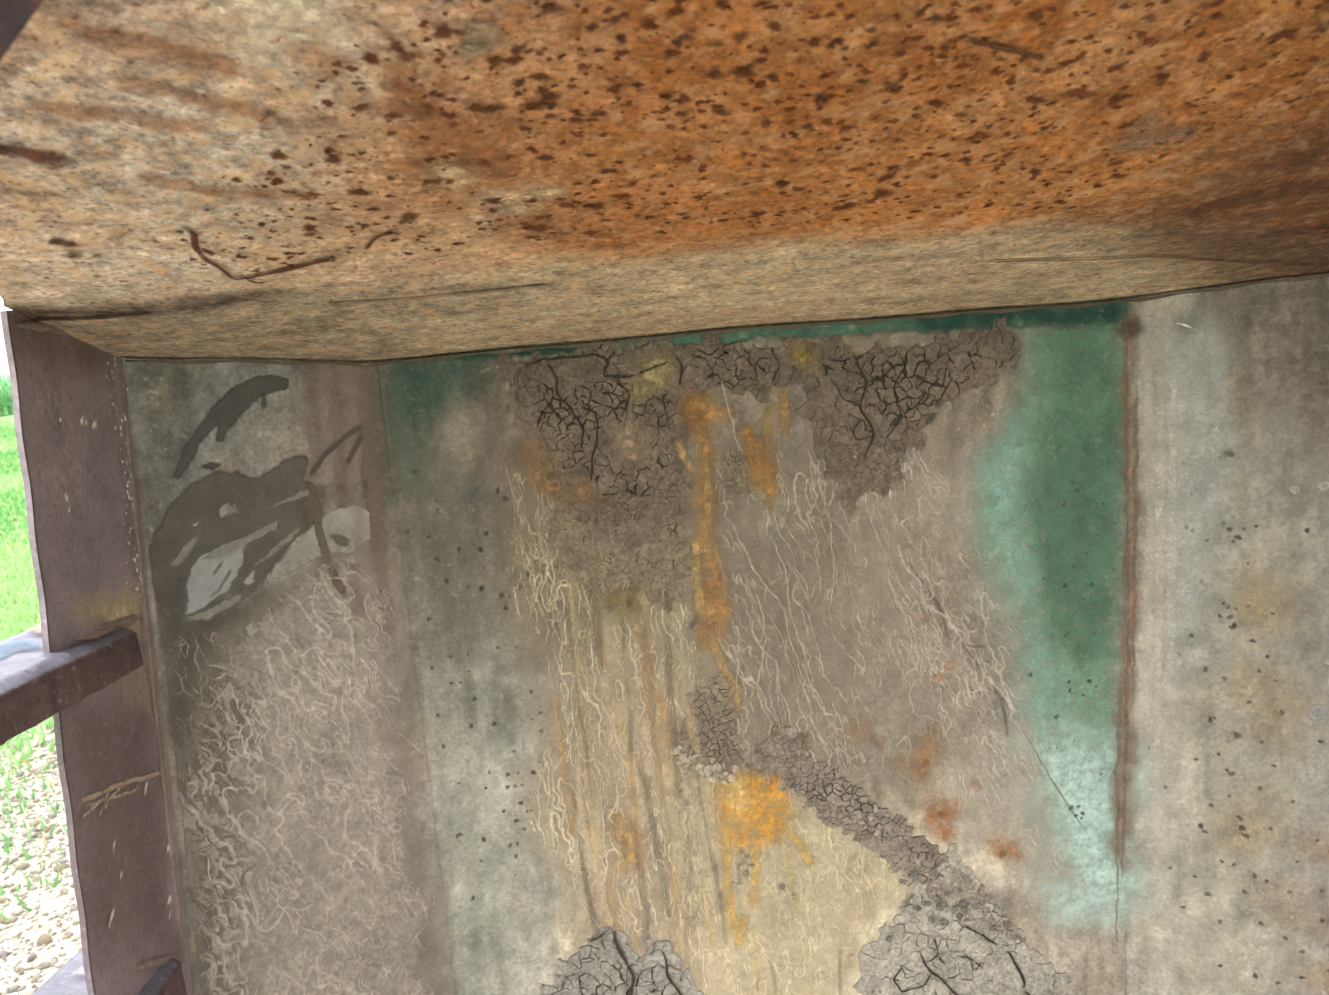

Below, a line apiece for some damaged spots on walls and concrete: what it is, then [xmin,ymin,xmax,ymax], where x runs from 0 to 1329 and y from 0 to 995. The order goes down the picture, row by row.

rust [217,0,360,55]
rust [0,146,71,169]
rust [360,79,564,234]
rust [49,239,79,258]
rust [16,306,154,321]
rust [677,396,740,708]
crack [932,598,985,664]
crack [995,691,1028,737]
rust [716,775,814,944]
leakage [204,829,370,993]